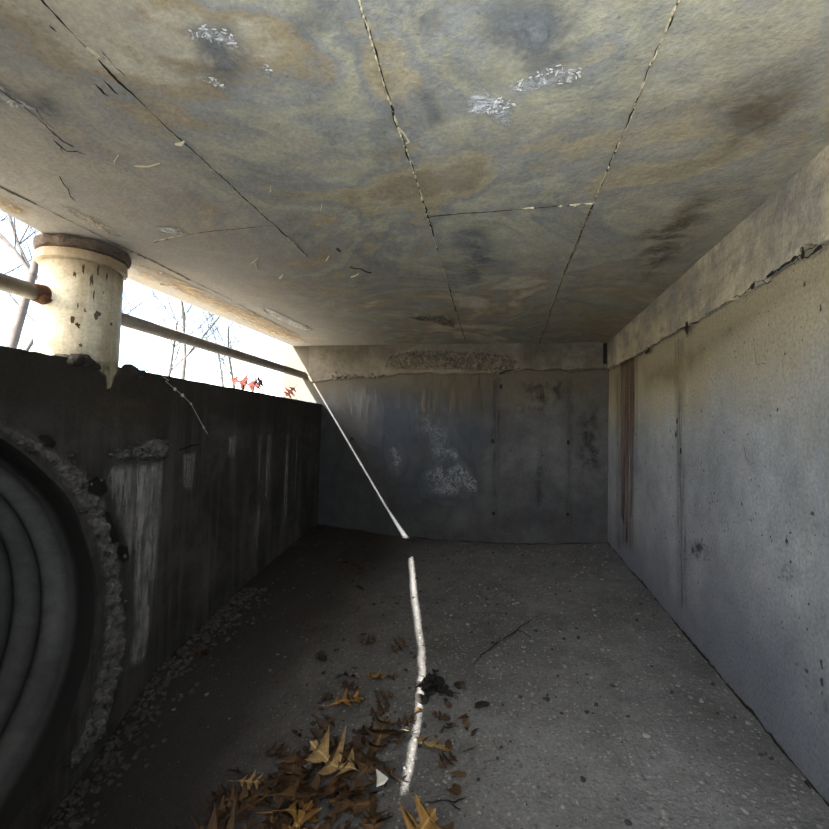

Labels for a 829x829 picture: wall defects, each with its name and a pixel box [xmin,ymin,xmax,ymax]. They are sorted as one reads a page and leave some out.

peeling [188,24,238,48]
peeling [467,89,516,124]
crack [36,108,86,155]
rust [73,264,108,299]
crack [492,244,822,378]
spalling [331,350,519,380]
water stain [370,396,478,501]
rust [621,358,634,545]
spalling [0,424,171,768]